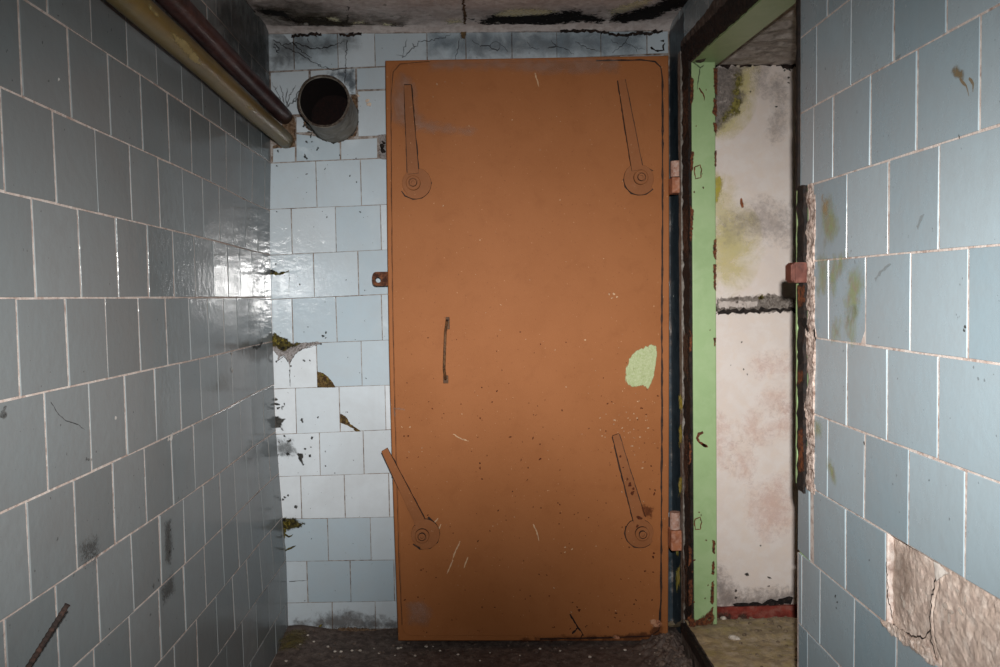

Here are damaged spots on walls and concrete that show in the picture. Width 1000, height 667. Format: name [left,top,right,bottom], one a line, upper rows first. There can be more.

damp [254,4,403,26]
crack [273,0,350,85]
crack [401,34,665,59]
damp [715,66,749,130]
spalling [797,183,816,495]
spalling [273,341,322,377]
spalling [317,371,335,388]
spalling [340,414,360,432]
flaking render [880,536,1000,667]